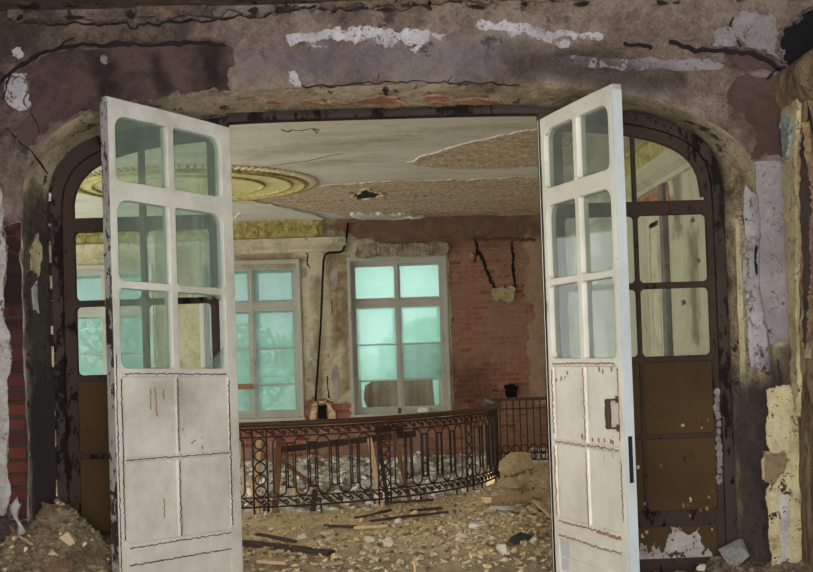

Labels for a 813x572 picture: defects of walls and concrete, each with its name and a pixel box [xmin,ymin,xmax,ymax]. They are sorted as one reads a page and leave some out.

crack [0,4,379,100]
peeling [286,25,449,54]
crack [412,0,517,8]
crack [623,17,788,81]
crack [472,235,536,289]
peeling [475,6,813,565]
spalling [0,188,43,522]
spalling [116,128,622,572]